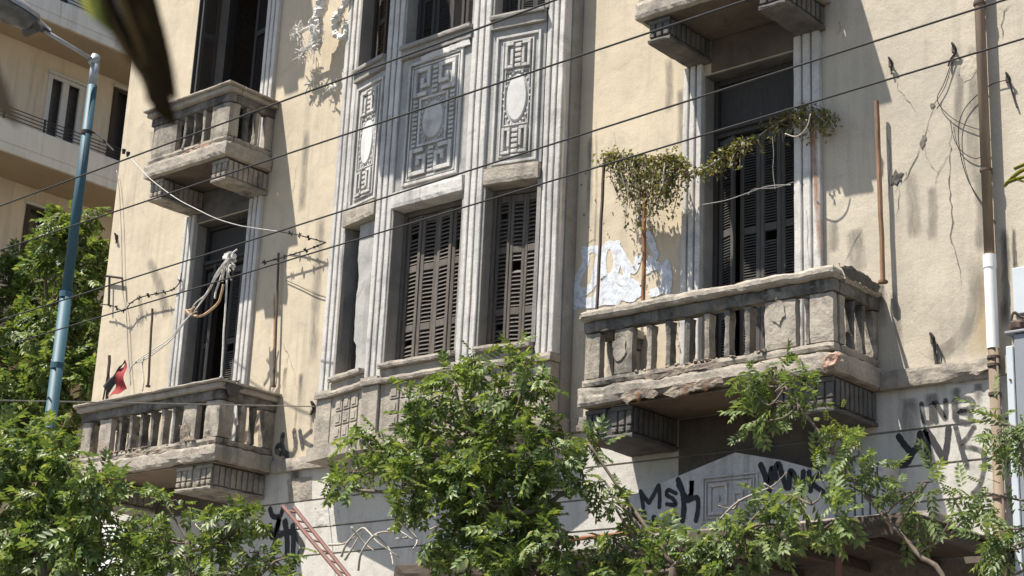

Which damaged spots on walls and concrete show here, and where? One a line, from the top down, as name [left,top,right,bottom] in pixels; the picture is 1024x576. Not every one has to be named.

crack [885,80,962,285]
spalling [620,360,732,405]
spalling [821,351,844,372]